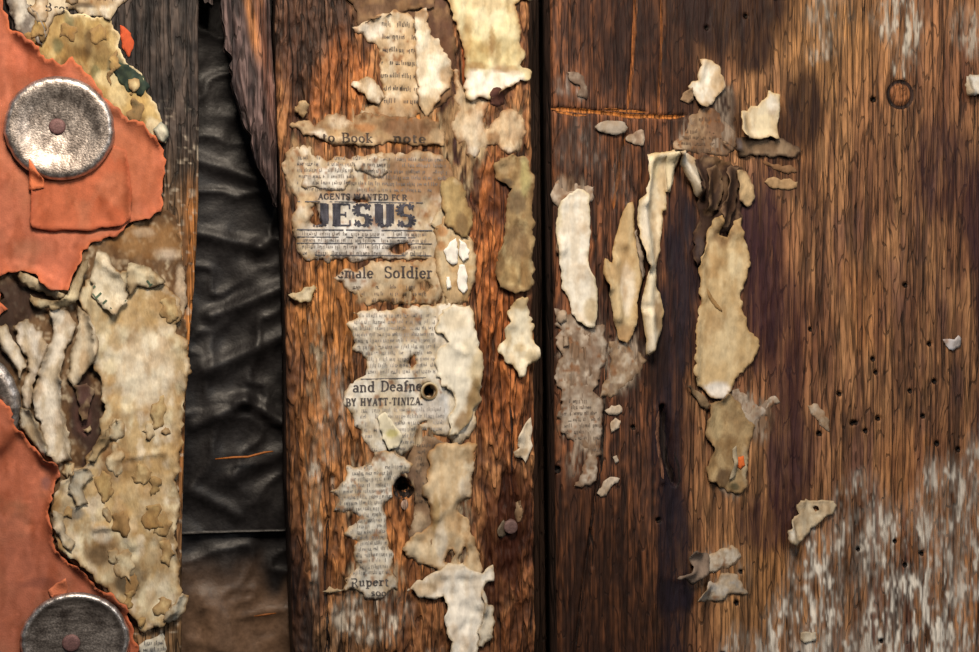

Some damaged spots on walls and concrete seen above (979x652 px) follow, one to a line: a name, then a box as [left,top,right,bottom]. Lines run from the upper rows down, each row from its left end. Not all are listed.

peeling [6,0,49,46]
peeling [351,76,385,104]
peeling [448,0,532,102]
peeling [680,59,725,107]
peeling [741,90,780,139]
peeling [556,149,704,356]
leakage [740,184,778,343]
peeling [497,297,541,377]
peeling [0,251,175,609]
peeling [402,305,496,652]
peeling [756,499,845,652]
peeling [843,506,979,652]